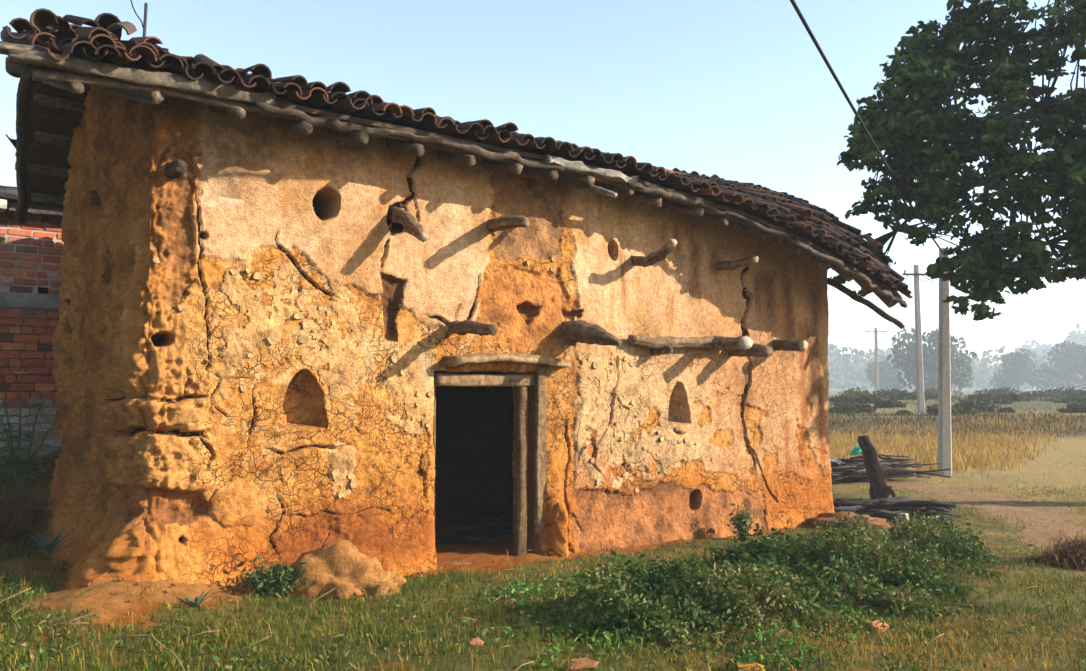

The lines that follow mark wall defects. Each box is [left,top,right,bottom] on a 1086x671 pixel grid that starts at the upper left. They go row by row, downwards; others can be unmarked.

spalling [150,132,209,311]
spalling [312,187,341,221]
spalling [386,201,407,236]
crack [384,156,422,248]
spalling [150,330,175,347]
crack [106,190,393,560]
peeling [211,267,367,401]
peeling [380,272,434,447]
spalling [476,170,768,553]
crack [740,266,750,336]
spalling [112,484,209,546]
peeling [325,441,358,498]